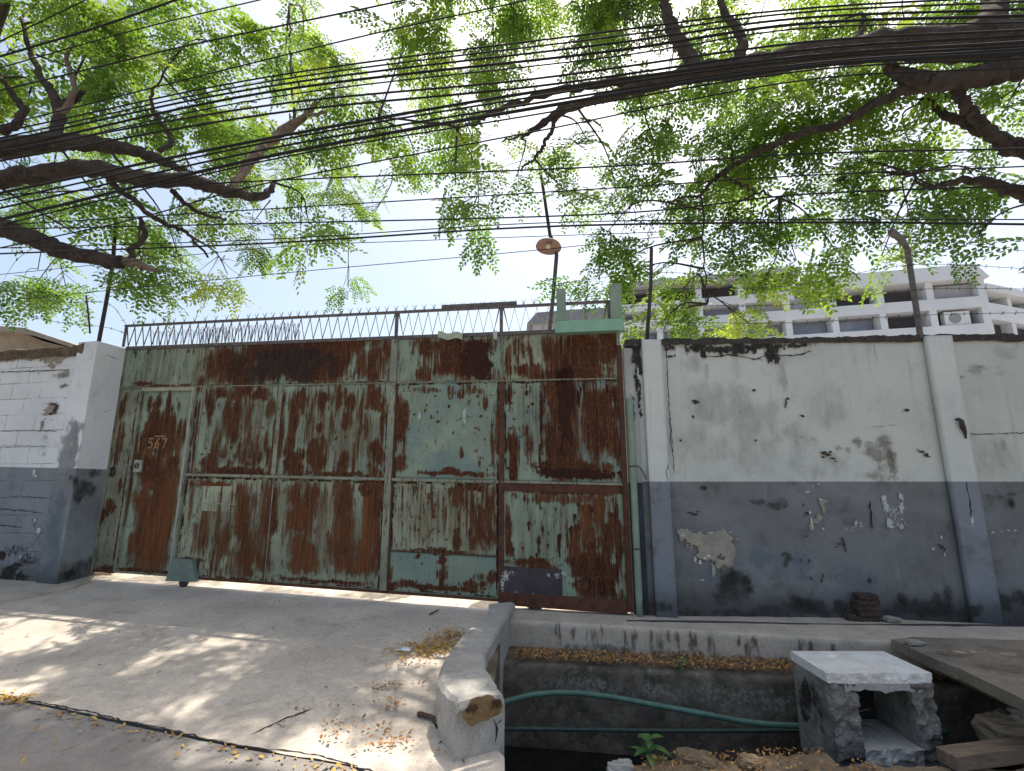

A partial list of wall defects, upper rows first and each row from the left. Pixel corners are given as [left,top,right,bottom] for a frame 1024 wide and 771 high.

damp [664,343,812,364]
corrosion [96,333,626,600]
damp [853,437,896,470]
peeling [881,493,908,529]
mould [0,545,36,581]
peeling [677,528,739,577]
spalling [461,694,503,726]